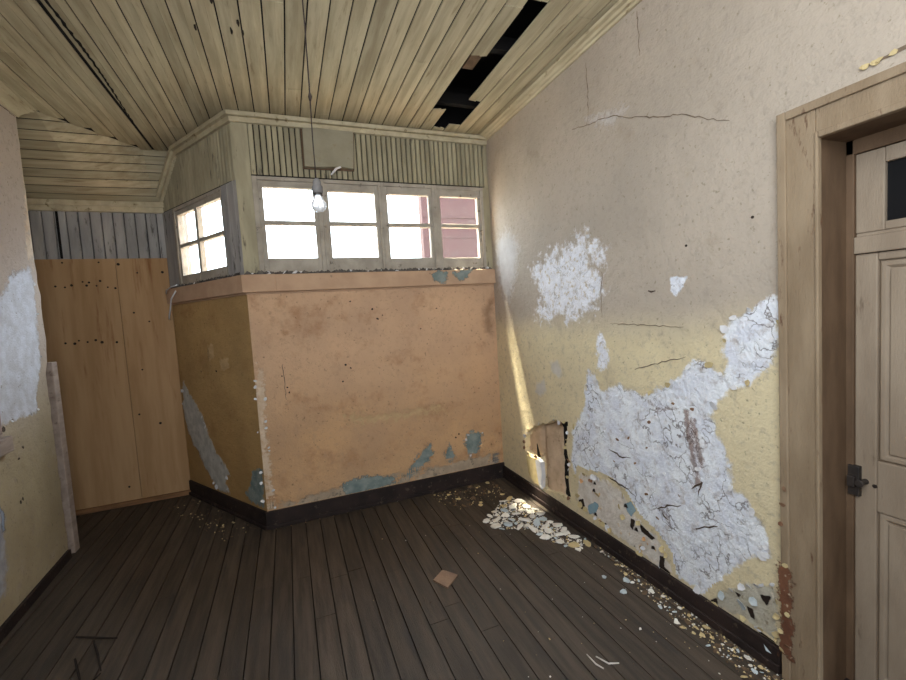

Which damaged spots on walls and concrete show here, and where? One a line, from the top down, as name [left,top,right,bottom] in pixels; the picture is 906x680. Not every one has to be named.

crack [572,69,730,130]
peeling [0,116,44,432]
peeling [181,376,233,497]
peeling [393,427,502,485]
peeling [491,218,796,680]